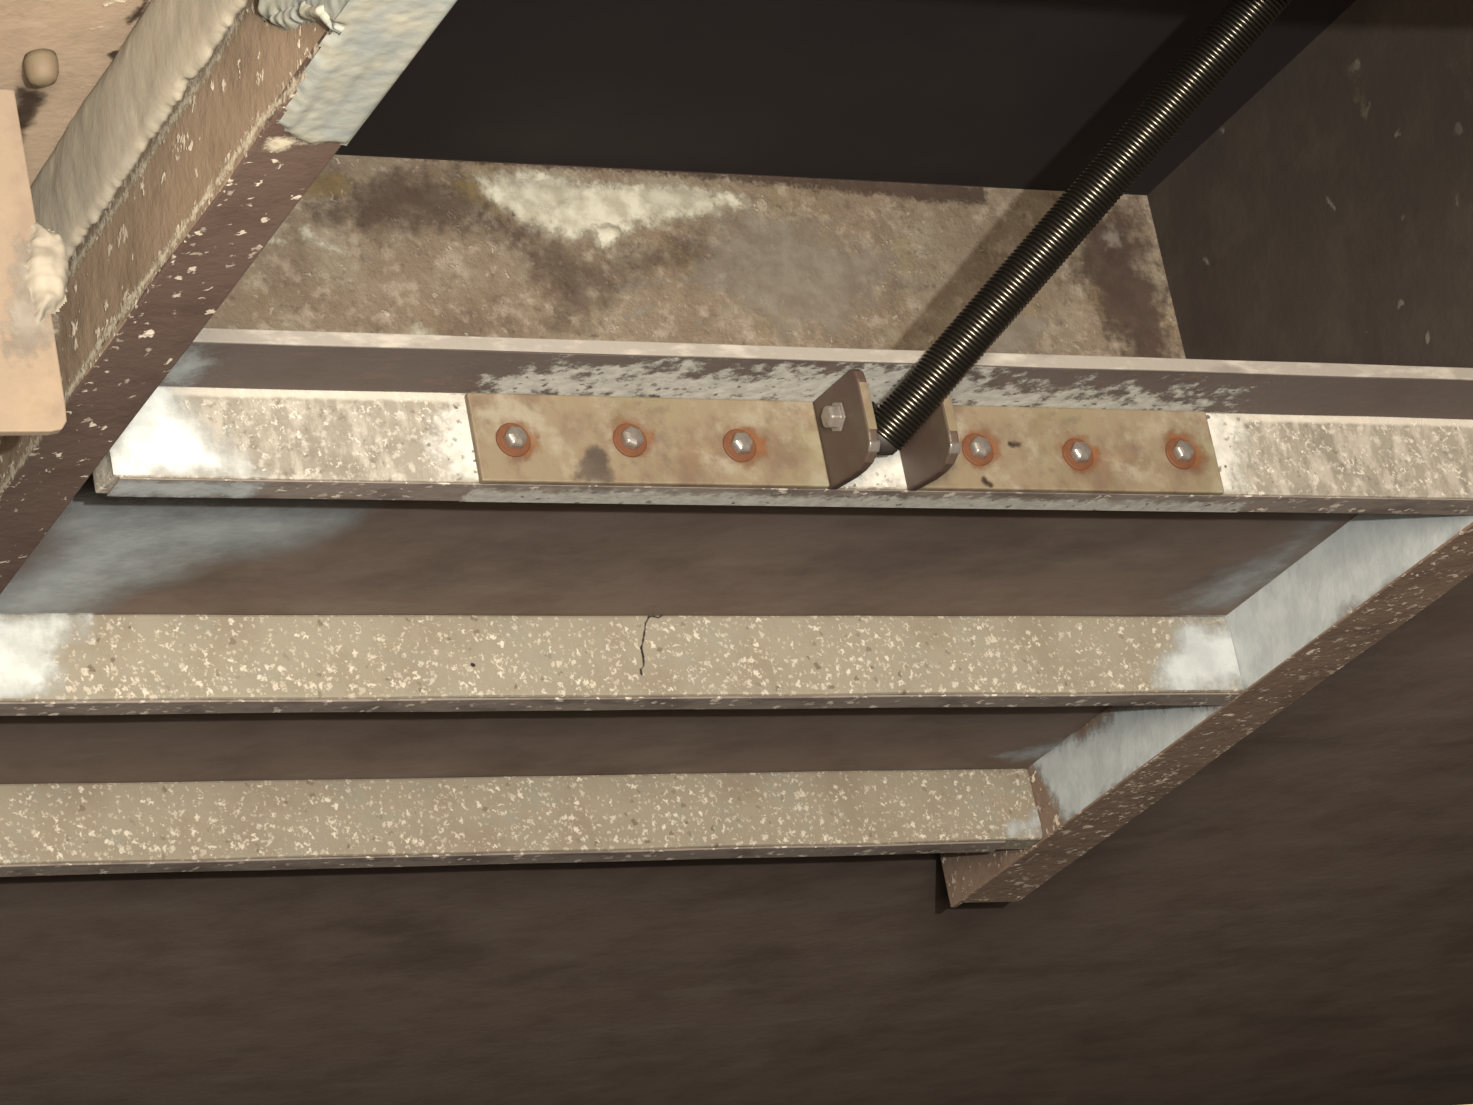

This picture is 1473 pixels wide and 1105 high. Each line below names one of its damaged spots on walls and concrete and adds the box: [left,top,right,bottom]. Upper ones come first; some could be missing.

leakage [67,19,239,276]
leakage [64,68,318,405]
leakage [449,159,986,328]
leakage [0,435,42,493]
crack [640,614,663,675]